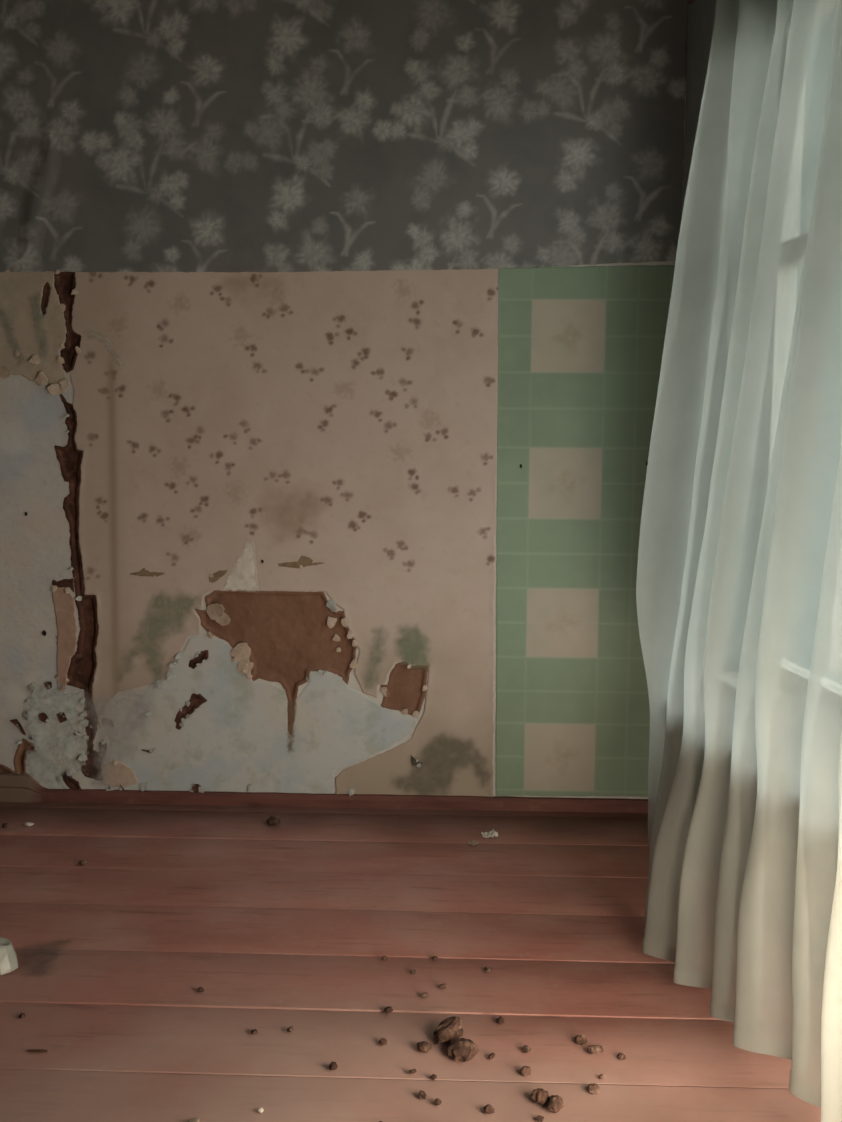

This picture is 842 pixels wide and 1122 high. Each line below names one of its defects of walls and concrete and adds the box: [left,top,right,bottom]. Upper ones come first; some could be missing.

crack [41,270,114,789]
peeling [0,581,428,794]
leakage [398,738,486,793]